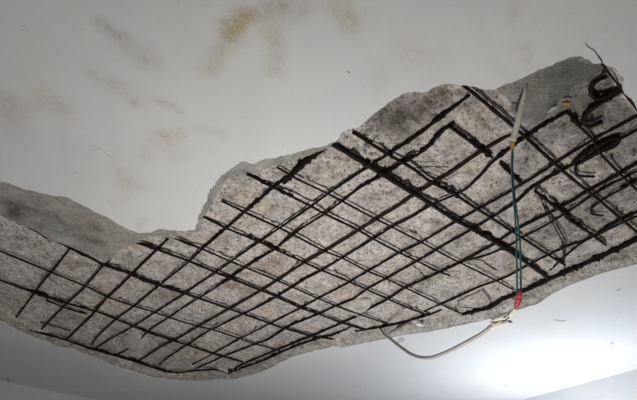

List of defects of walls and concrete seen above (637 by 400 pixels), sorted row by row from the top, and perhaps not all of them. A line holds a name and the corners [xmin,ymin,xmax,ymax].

spalling [0,250,386,381]
spalling [0,56,637,351]